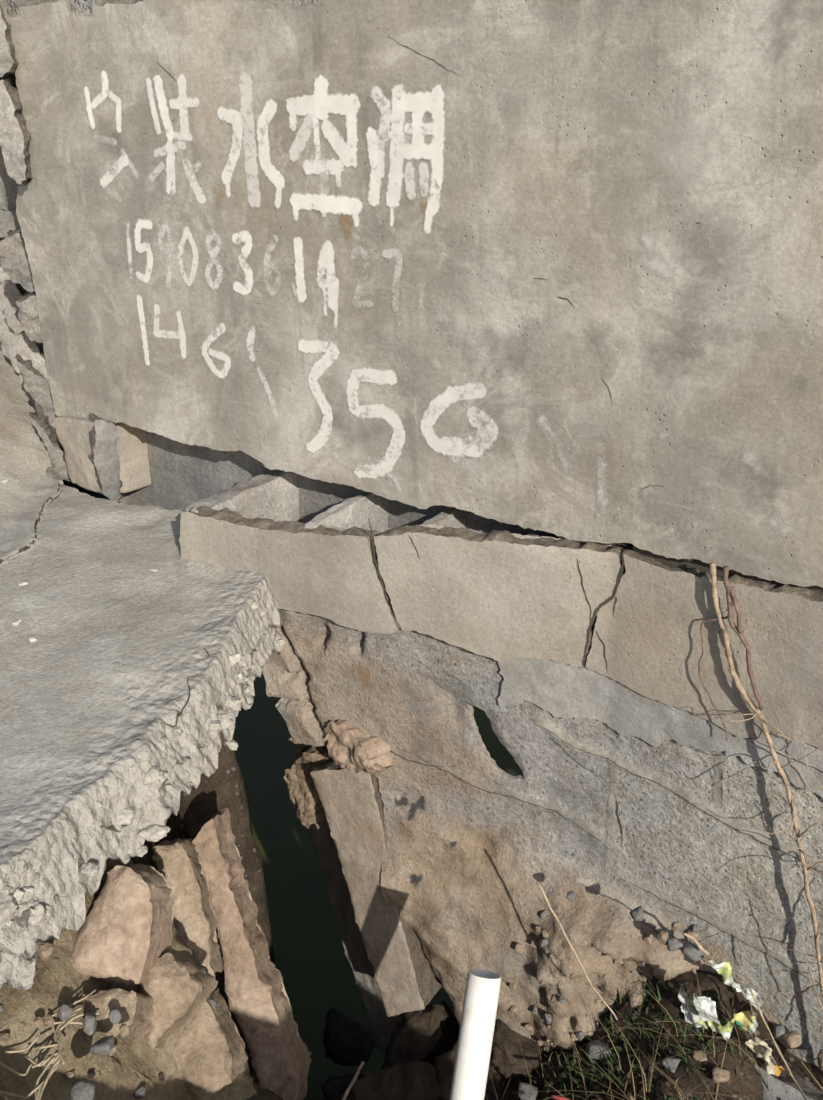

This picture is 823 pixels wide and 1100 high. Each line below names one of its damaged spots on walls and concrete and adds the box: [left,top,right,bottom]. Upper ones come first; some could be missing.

crack [0,484,60,564]
crack [368,518,400,630]
crack [577,545,823,672]